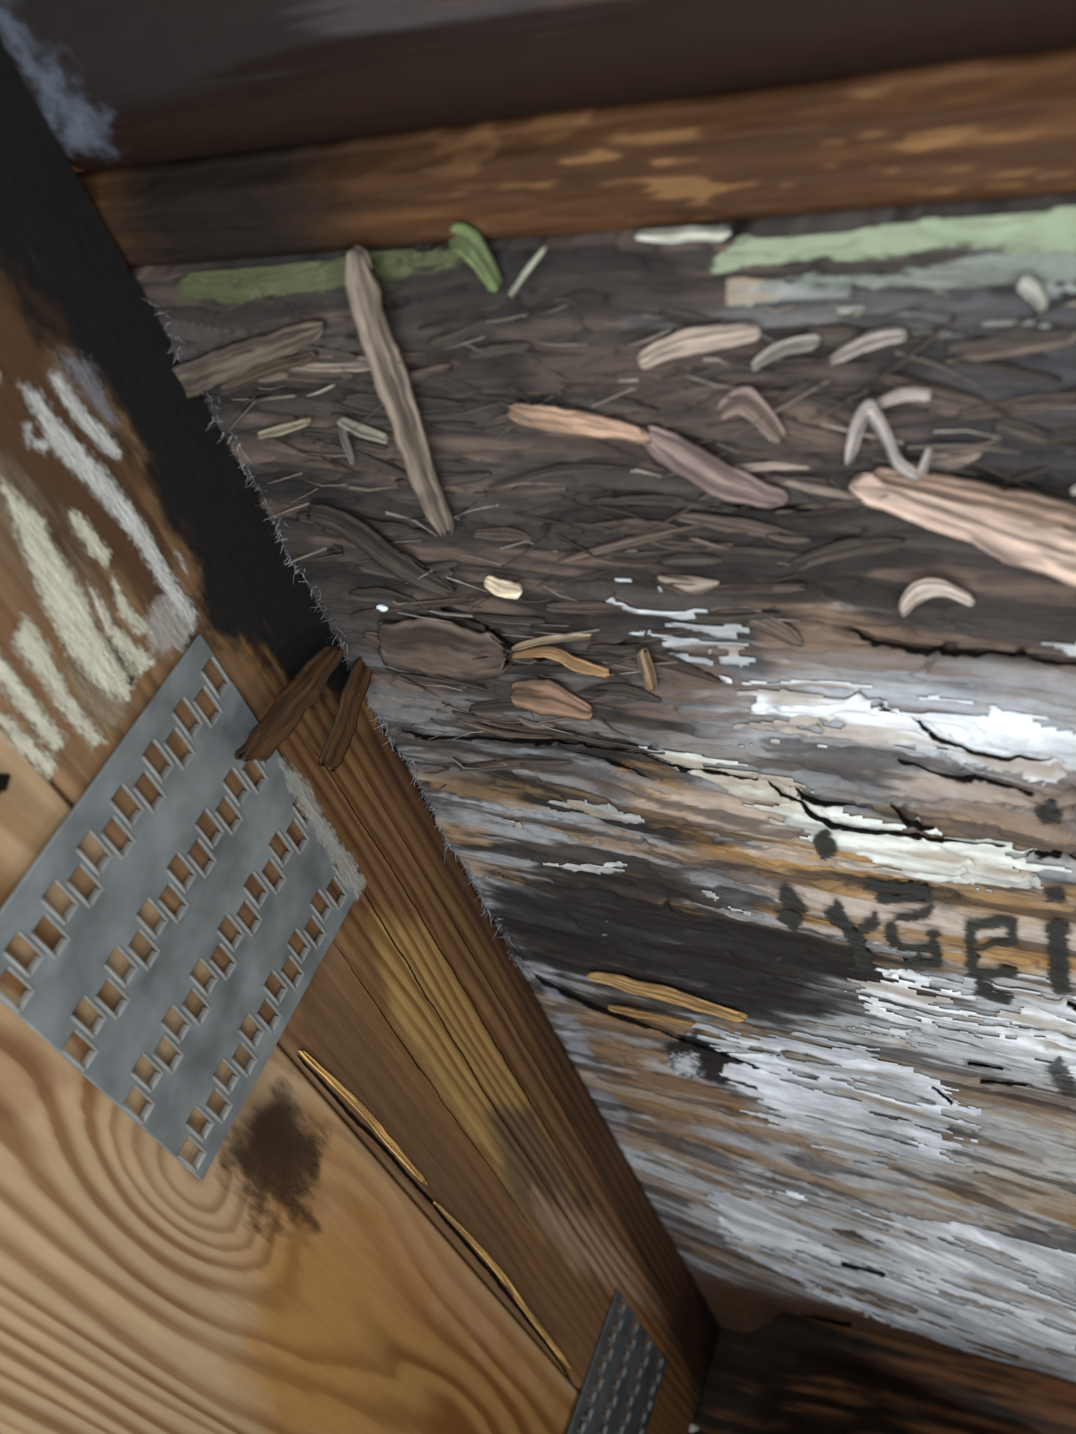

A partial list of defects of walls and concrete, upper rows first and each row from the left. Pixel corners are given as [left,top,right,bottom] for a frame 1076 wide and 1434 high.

leakage [0,0,1076,779]
crack [306,739,668,1298]
crack [534,974,780,1069]
peeling [807,1021,937,1050]
peeling [1016,973,1051,985]
leakage [222,1090,324,1228]
crack [297,1054,572,1383]